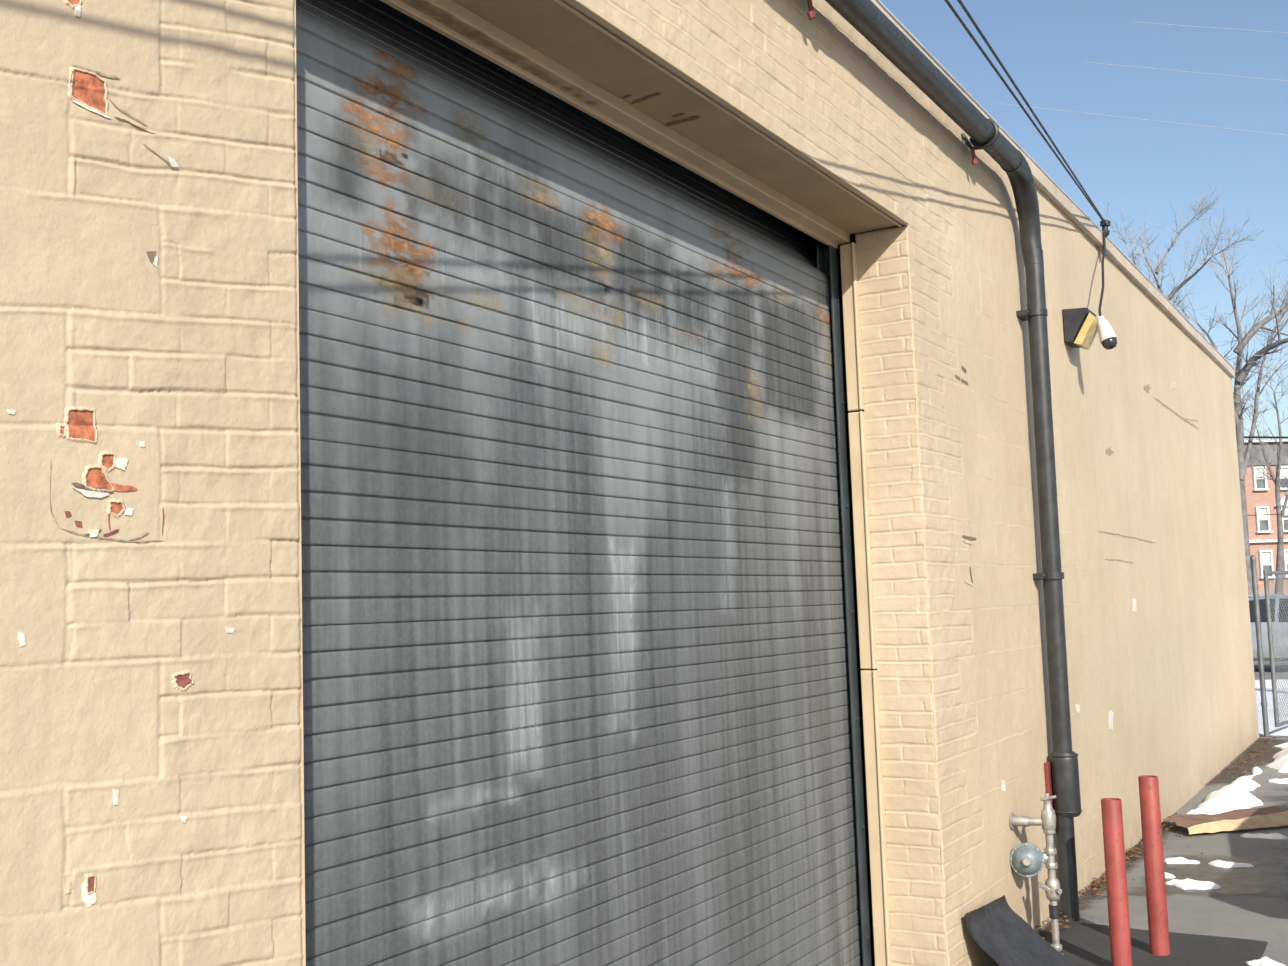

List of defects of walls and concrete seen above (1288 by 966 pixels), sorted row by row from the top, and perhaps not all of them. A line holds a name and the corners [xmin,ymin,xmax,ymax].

peeling [63,0,83,17]
spalling [68,65,179,169]
rust [346,49,415,185]
rust [366,210,433,314]
damp [430,162,521,236]
rust [585,211,621,275]
damp [543,210,711,372]
damp [722,288,817,488]
peeling [50,406,164,544]
peeling [171,670,194,692]